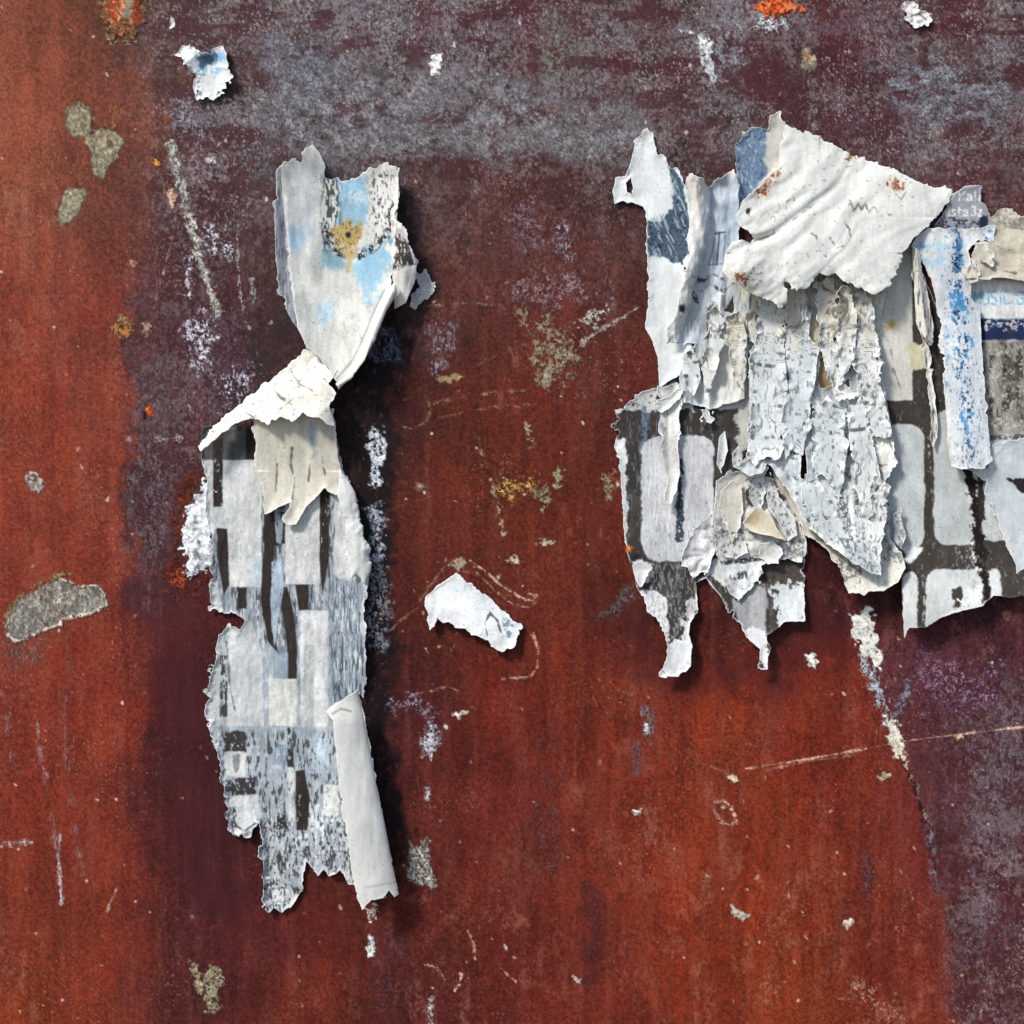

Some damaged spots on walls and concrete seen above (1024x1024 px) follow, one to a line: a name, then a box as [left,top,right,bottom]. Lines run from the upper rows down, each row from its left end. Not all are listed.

corrosion [97,0,148,46]
corrosion [753,0,806,33]
corrosion [801,48,817,86]
peeling [65,102,125,179]
peeling [56,188,86,225]
corrosion [108,313,152,339]
corrosion [161,467,209,600]
peeling [4,572,108,667]
peeling [805,653,819,669]
peeling [406,837,437,889]